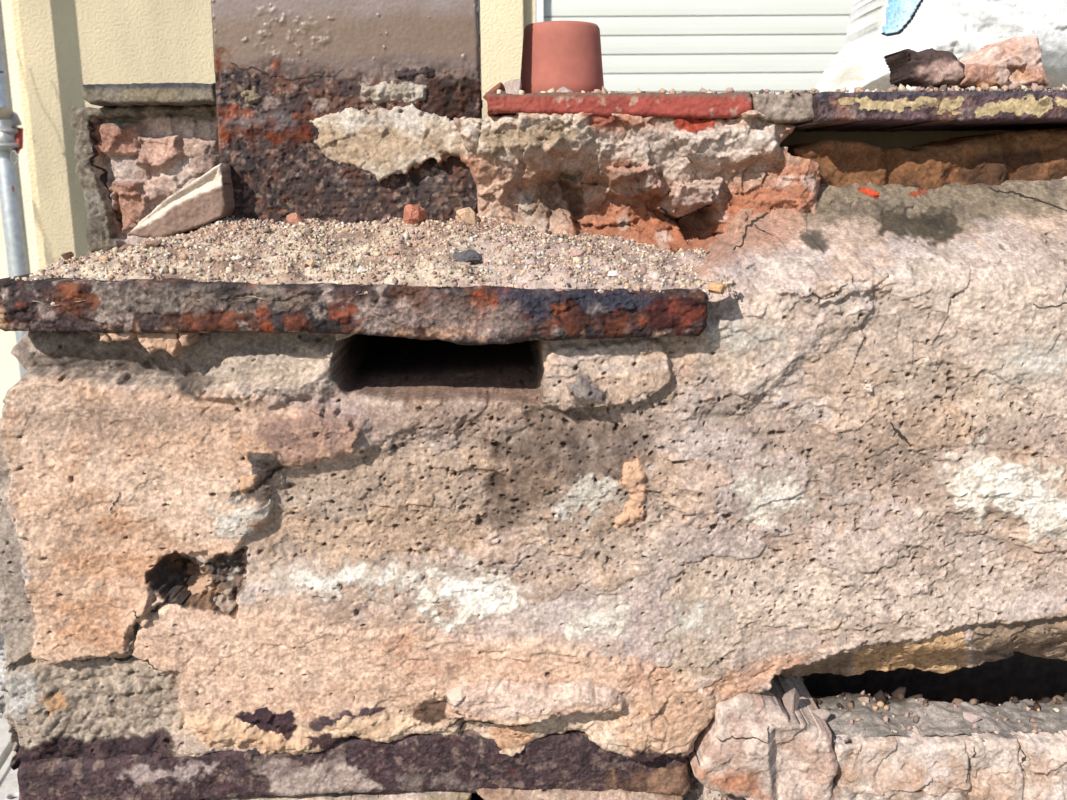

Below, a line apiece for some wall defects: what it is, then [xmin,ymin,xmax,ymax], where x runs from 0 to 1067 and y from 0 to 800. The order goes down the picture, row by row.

rust [413,75,475,119]
spalling [453,110,821,253]
crack [733,212,772,250]
rust [550,294,707,338]
peeling [184,570,237,612]
rust [10,728,174,770]
rust [235,707,296,741]
rust [307,707,385,749]
rust [627,749,687,765]
spalling [768,683,800,713]
spalling [811,709,831,722]
spalling [963,712,982,723]